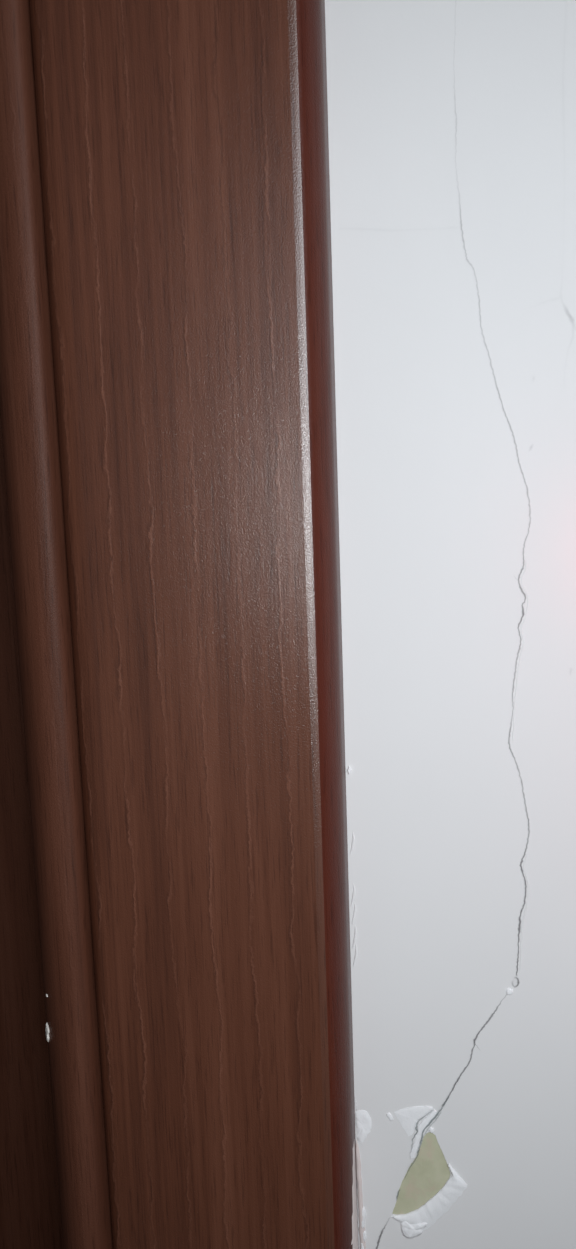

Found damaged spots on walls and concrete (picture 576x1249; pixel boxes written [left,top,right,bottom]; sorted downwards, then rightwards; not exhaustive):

crack [443,854,530,1105]
peeling [355,1102,371,1143]
peeling [387,1101,467,1238]